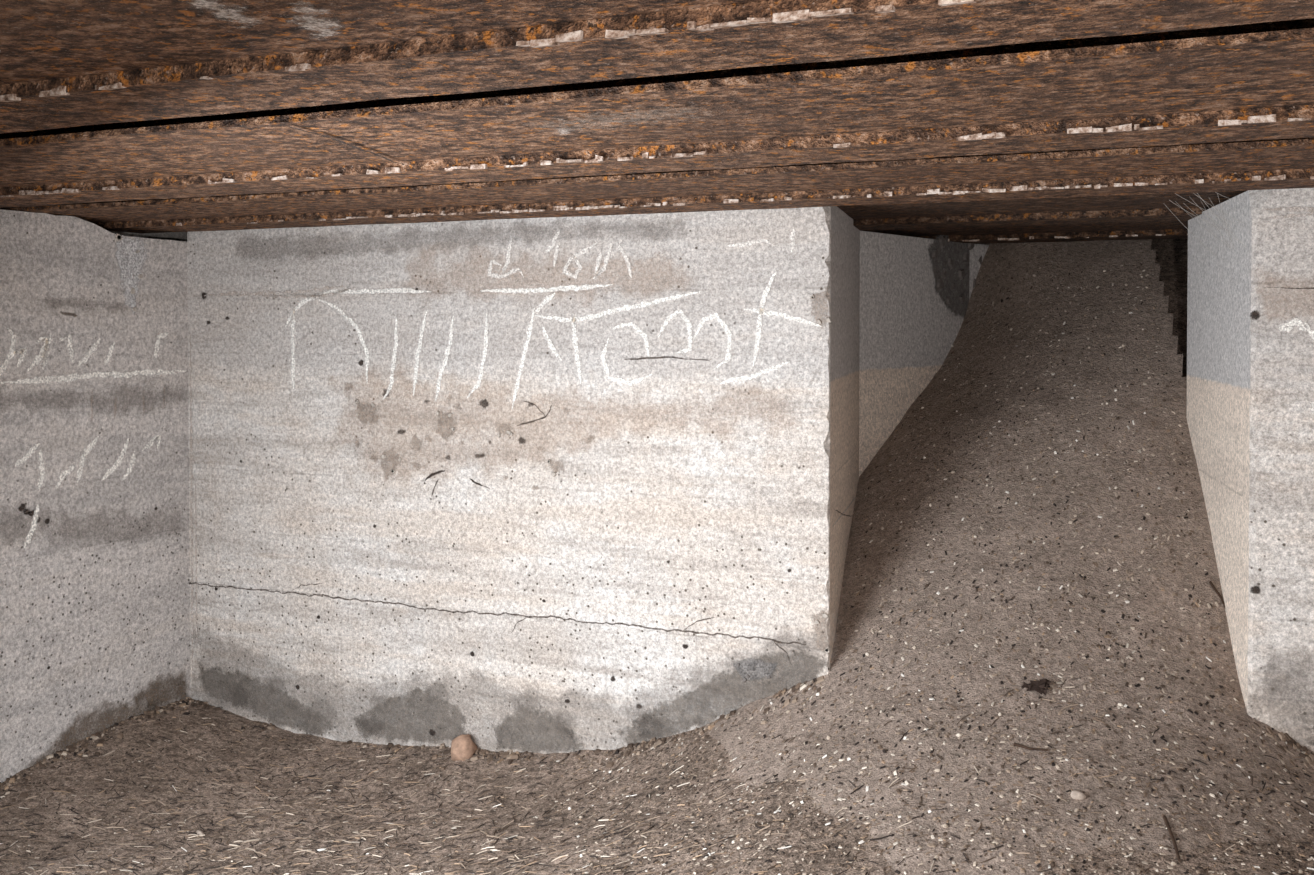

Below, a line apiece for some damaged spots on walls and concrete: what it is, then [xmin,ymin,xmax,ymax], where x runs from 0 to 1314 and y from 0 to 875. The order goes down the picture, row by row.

water stain [190,342,330,734]
water stain [354,688,464,742]
water stain [496,707,579,753]
water stain [621,652,823,745]